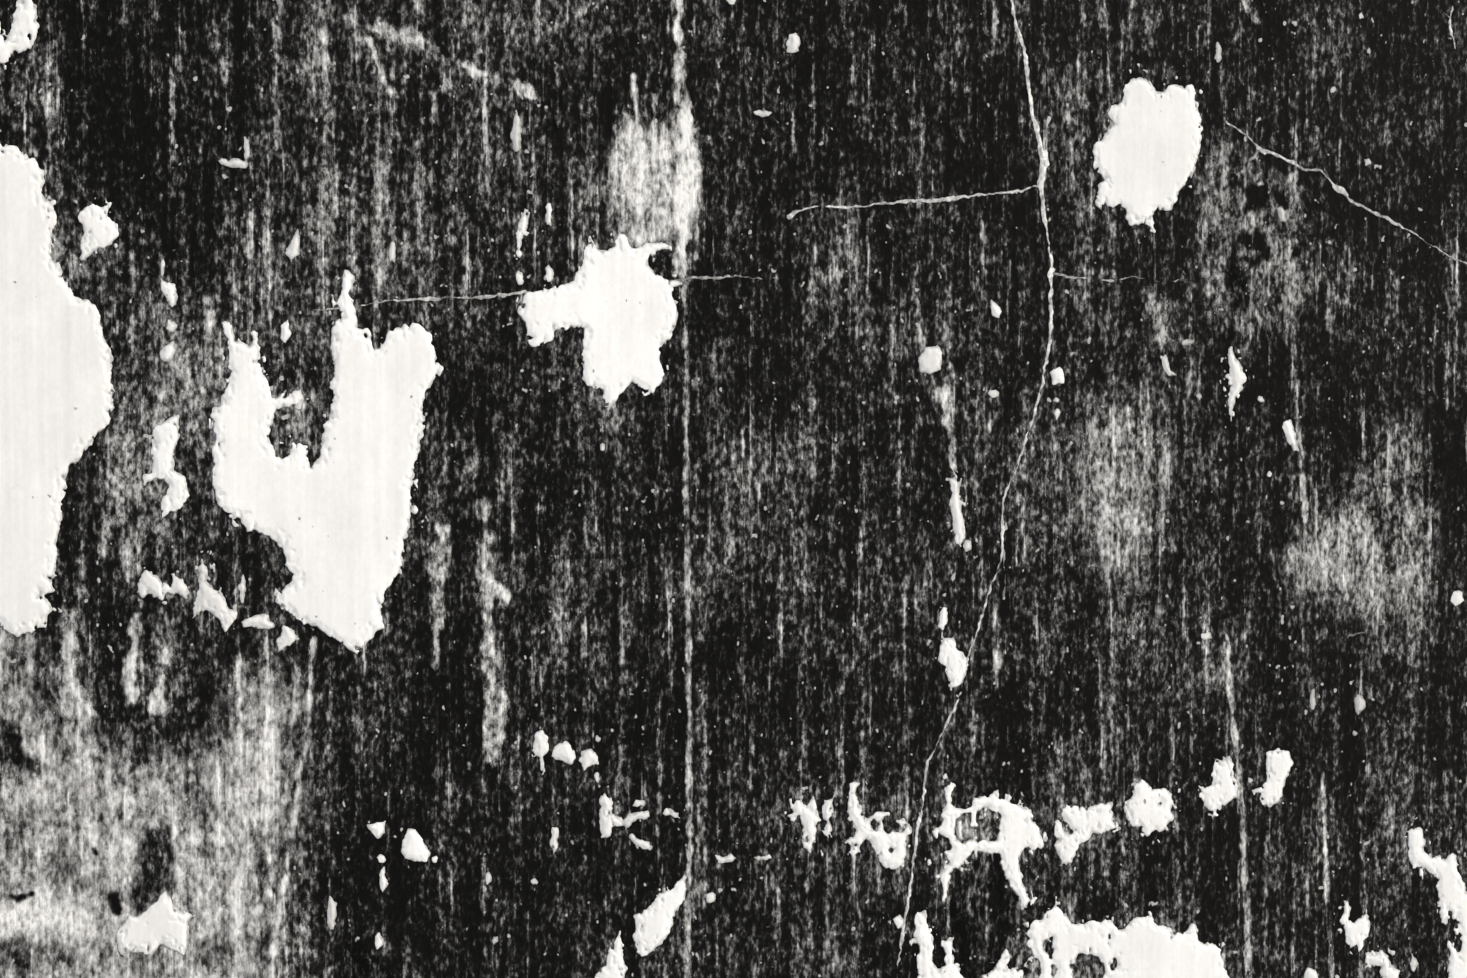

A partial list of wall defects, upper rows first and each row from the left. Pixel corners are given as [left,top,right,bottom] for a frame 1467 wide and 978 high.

peeling [1092,63,1203,237]
crack [1225,121,1467,264]
peeling [0,144,119,637]
peeling [137,259,443,654]
peeling [516,203,683,411]
crack [787,0,1178,965]
peeling [595,875,716,978]
peeling [784,781,912,870]
peeling [893,910,963,978]
peeling [927,773,1230,978]
peeling [1199,748,1293,820]
peeling [1405,817,1467,978]